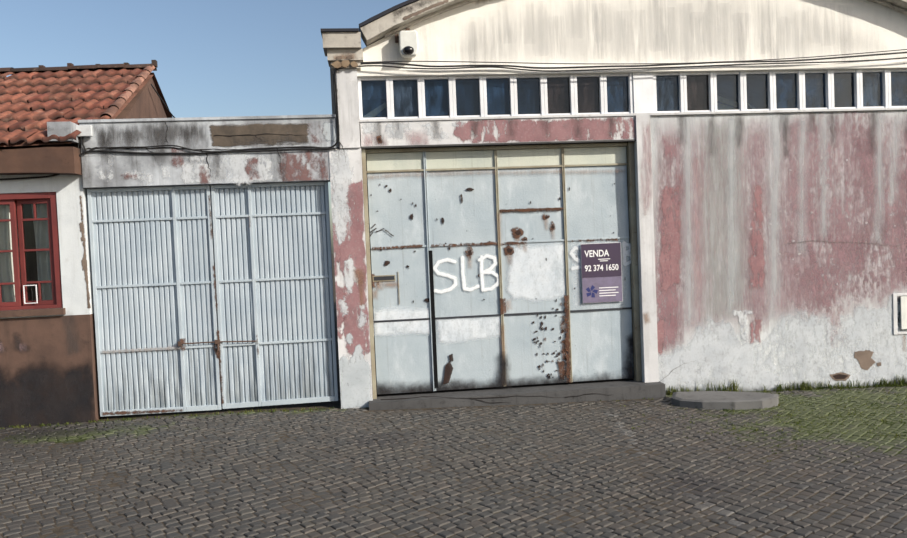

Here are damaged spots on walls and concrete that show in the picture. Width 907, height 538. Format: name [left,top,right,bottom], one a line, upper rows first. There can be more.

peeling [362,117,648,145]
peeling [79,195,91,308]
peeling [162,123,393,409]
rust [372,227,528,259]
rust [500,207,560,231]
damp [0,365,94,428]
rust [213,330,224,404]
rust [376,295,635,395]